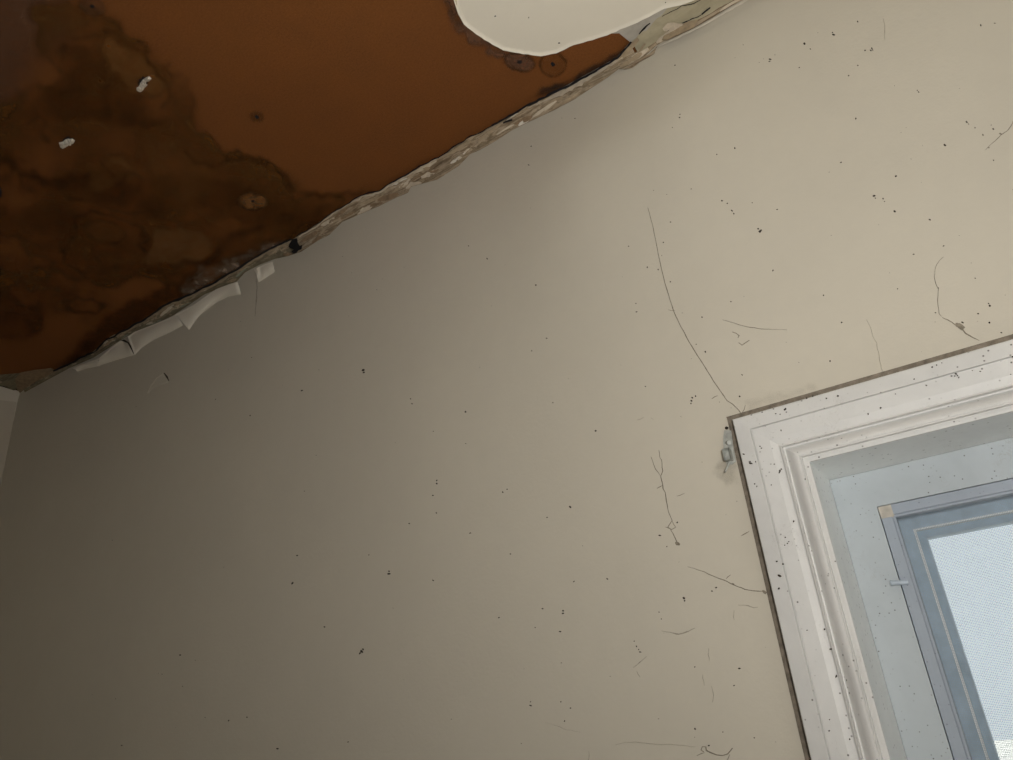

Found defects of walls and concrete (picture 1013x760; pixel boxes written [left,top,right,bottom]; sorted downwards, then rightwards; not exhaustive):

peeling [454,0,694,56]
water stain [0,3,321,363]
crack [648,209,745,413]
crack [651,452,685,545]
crack [690,567,767,618]